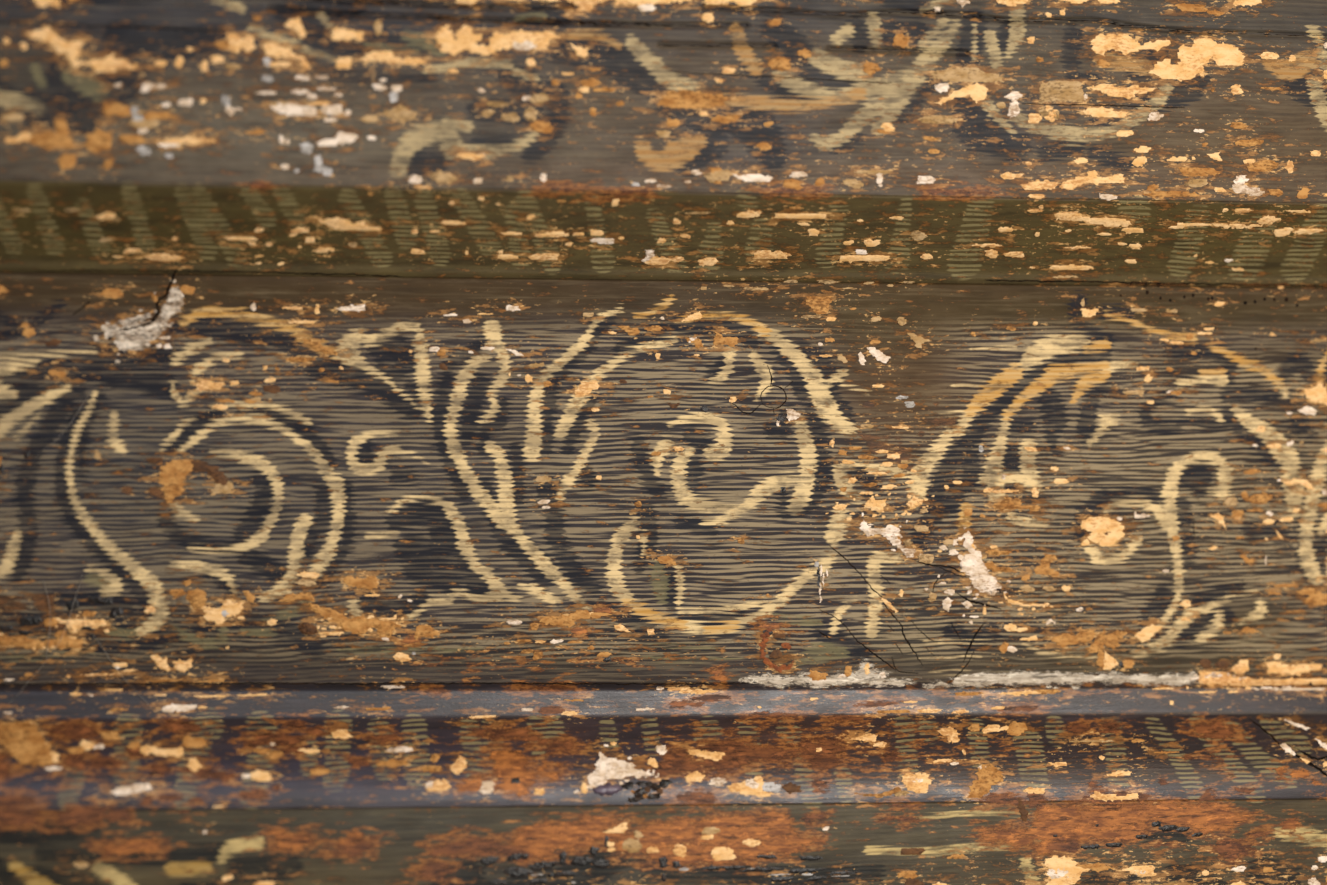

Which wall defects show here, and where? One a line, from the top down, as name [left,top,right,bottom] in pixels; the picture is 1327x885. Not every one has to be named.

peeling [542,0,756,23]
peeling [154,16,310,72]
peeling [331,19,426,69]
peeling [435,25,625,134]
peeling [1143,122,1327,237]
crack [115,269,176,332]
crack [817,545,1000,685]
spalling [1153,654,1327,705]
peeling [0,711,208,772]
spalling [574,741,802,802]
peeling [855,689,1061,798]
crack [1249,718,1327,776]